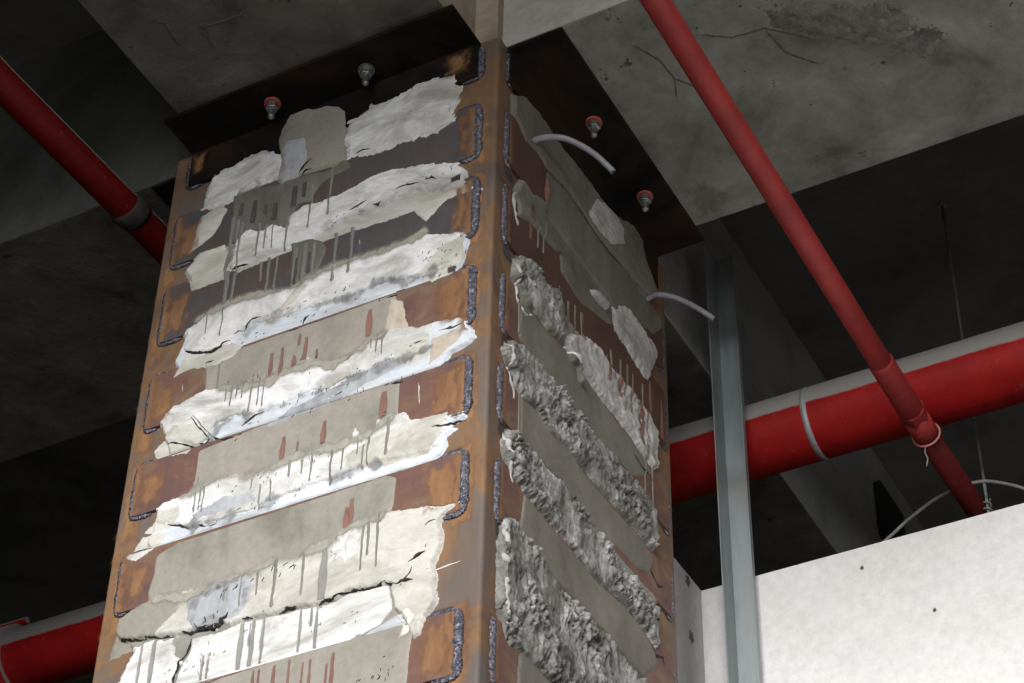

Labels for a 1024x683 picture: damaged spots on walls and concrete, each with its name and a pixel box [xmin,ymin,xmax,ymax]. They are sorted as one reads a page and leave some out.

crack [704,28,819,64]
damp [219,106,355,336]
damp [205,295,408,411]
crack [168,322,467,448]
peeling [174,150,483,377]
corrosion [437,258,482,330]
corrosion [103,376,172,643]
damp [148,380,415,683]
peeling [108,501,460,683]
peeling [127,411,468,561]
crack [279,519,436,632]
corrosion [428,444,474,527]